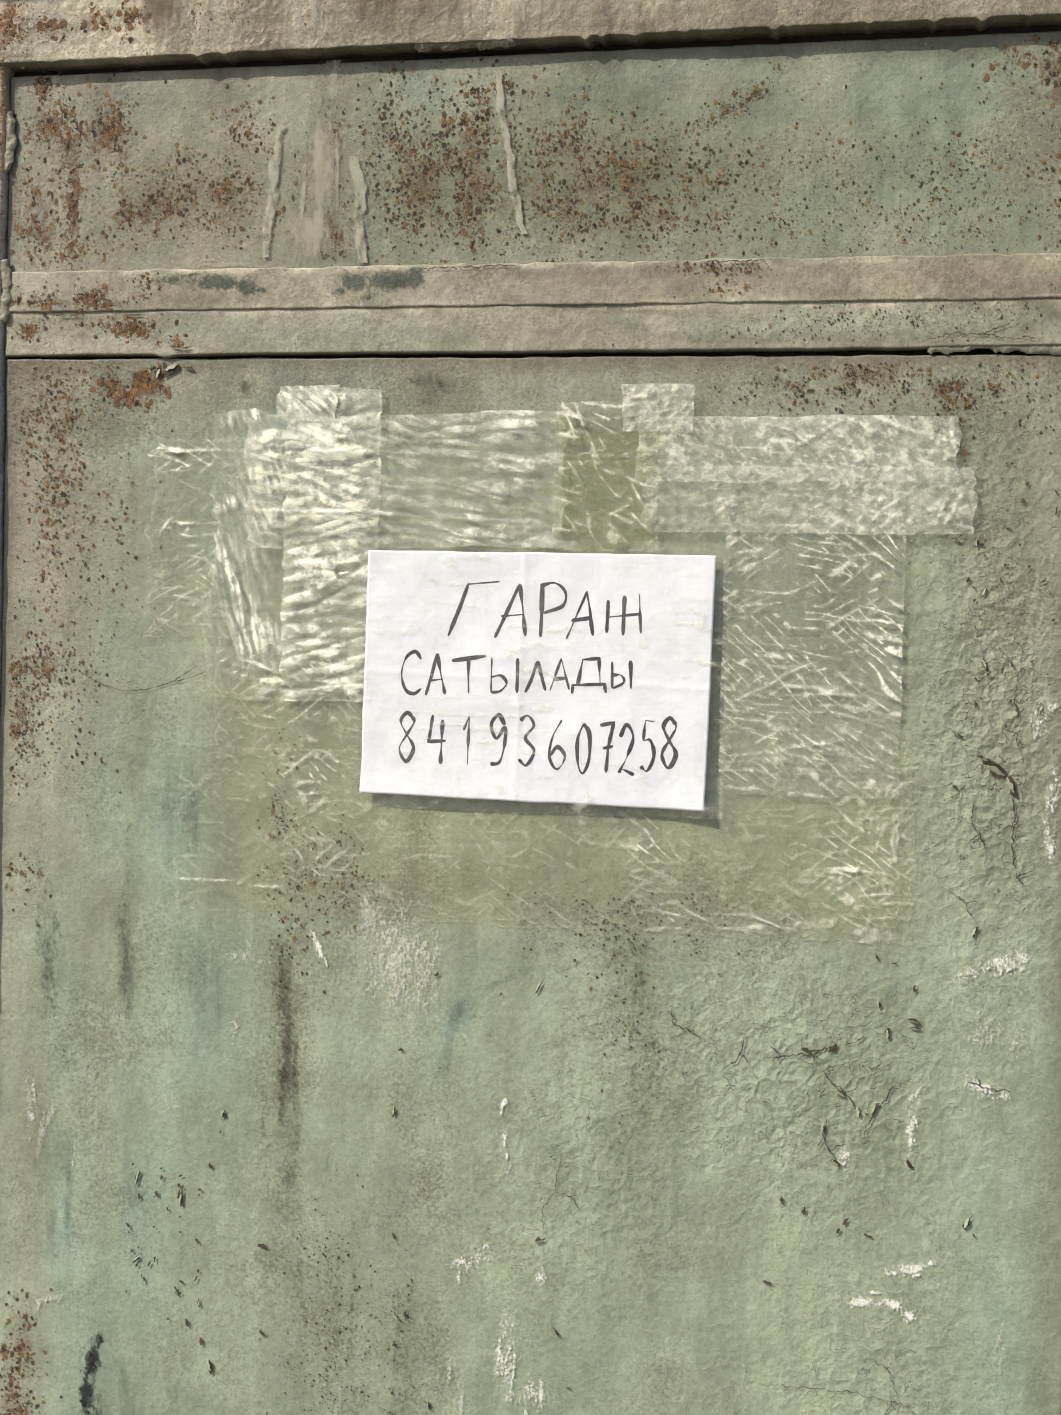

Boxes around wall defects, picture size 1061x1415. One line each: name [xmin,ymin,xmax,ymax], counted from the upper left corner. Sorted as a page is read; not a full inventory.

rust [0,0,1061,806]
rust [4,829,52,927]
crack [971,797,1033,884]
crack [671,1010,699,1037]
crack [722,1037,895,1161]
rust [0,1288,62,1415]
water stain [79,1325,103,1415]
crack [757,1351,921,1415]